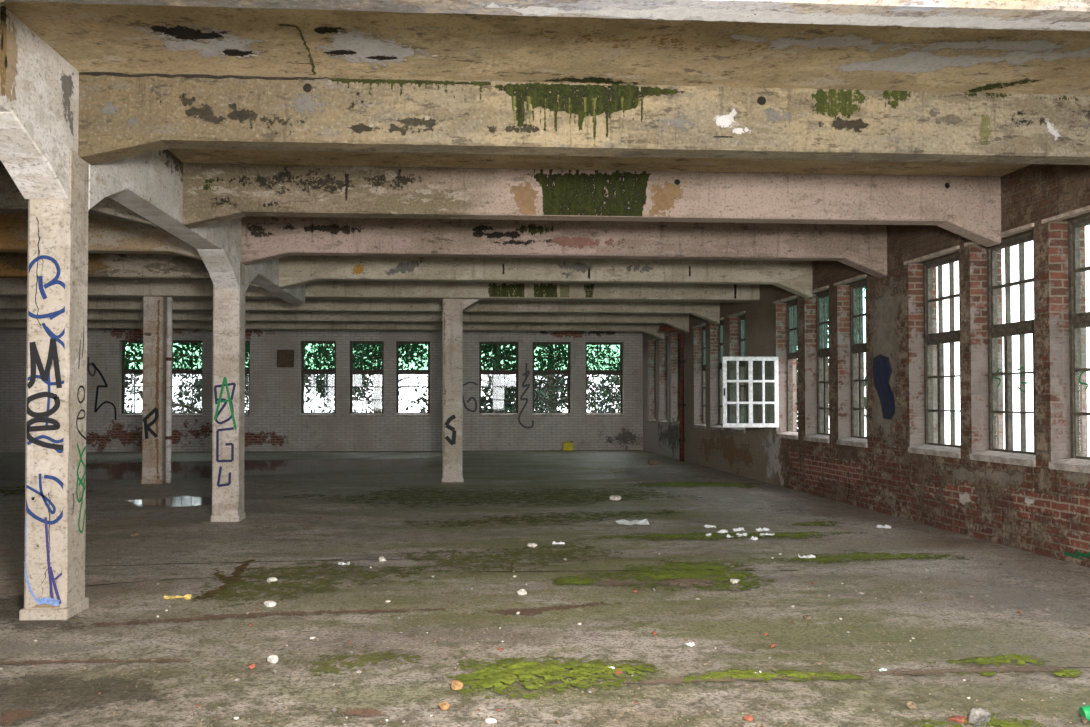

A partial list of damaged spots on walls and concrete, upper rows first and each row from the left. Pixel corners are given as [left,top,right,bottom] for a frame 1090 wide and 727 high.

peeling [133,23,265,61]
peeling [479,2,1090,73]
leakage [487,123,548,134]
mould [818,115,869,132]
flaking render [86,420,142,452]
flaking render [172,420,212,445]
flaking render [245,431,288,449]
flaking render [758,427,864,501]
flaking render [912,465,1090,555]